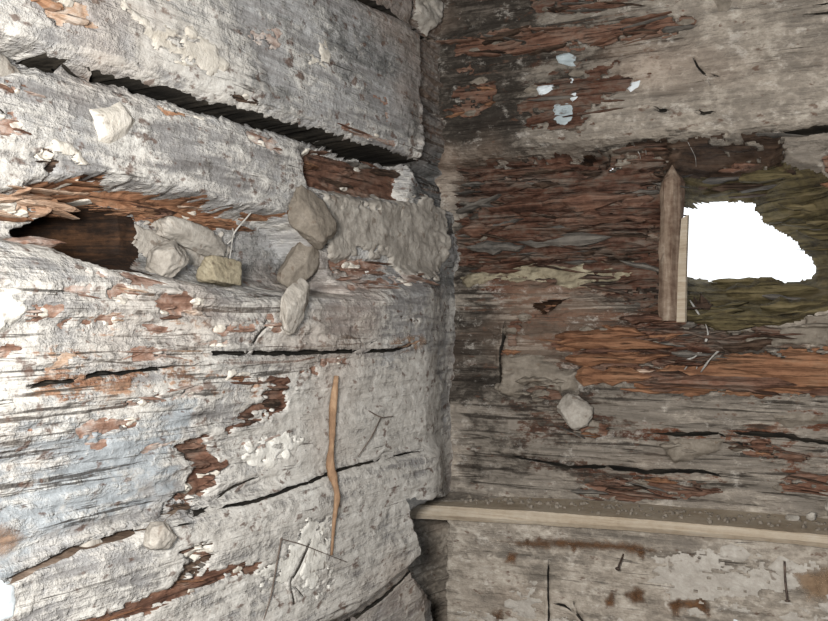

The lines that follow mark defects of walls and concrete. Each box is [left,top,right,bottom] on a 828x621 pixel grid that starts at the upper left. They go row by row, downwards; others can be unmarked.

peeling [517,53,652,140]
spalling [301,148,401,201]
spalling [0,139,289,335]
spalling [683,158,828,340]
crack [0,314,420,413]
spalling [225,370,291,434]
spalling [166,434,229,510]
crack [182,444,427,524]
crack [489,448,743,501]
crack [640,426,828,459]
crack [284,539,311,607]
crack [336,568,411,621]